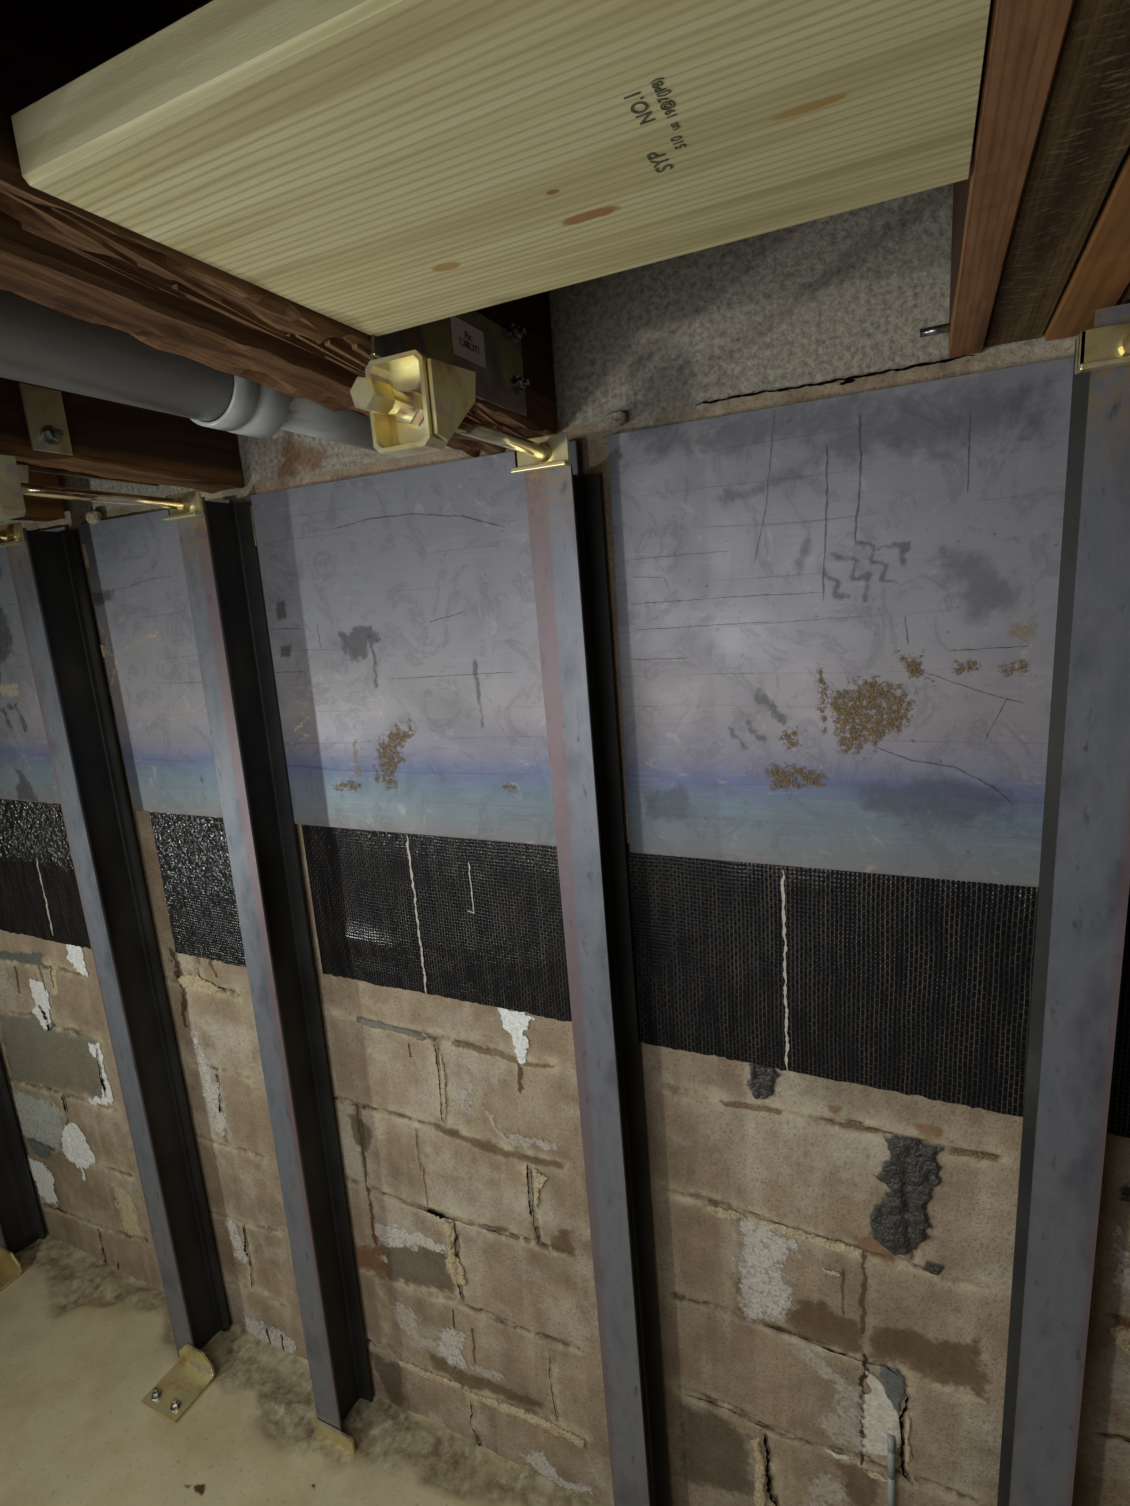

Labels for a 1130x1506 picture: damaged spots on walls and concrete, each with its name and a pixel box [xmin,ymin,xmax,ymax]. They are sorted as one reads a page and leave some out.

rust [335,718,414,792]
rust [764,726,827,790]
rust [817,650,934,755]
damp [168,947,231,1138]
spalling [451,1041,552,1068]
peeling [27,1155,59,1207]
peeling [61,1123,95,1181]
damp [351,1104,454,1291]
crack [377,1164,548,1298]
damp [437,1085,562,1168]
damp [391,1302,540,1407]
crack [760,1321,913,1485]